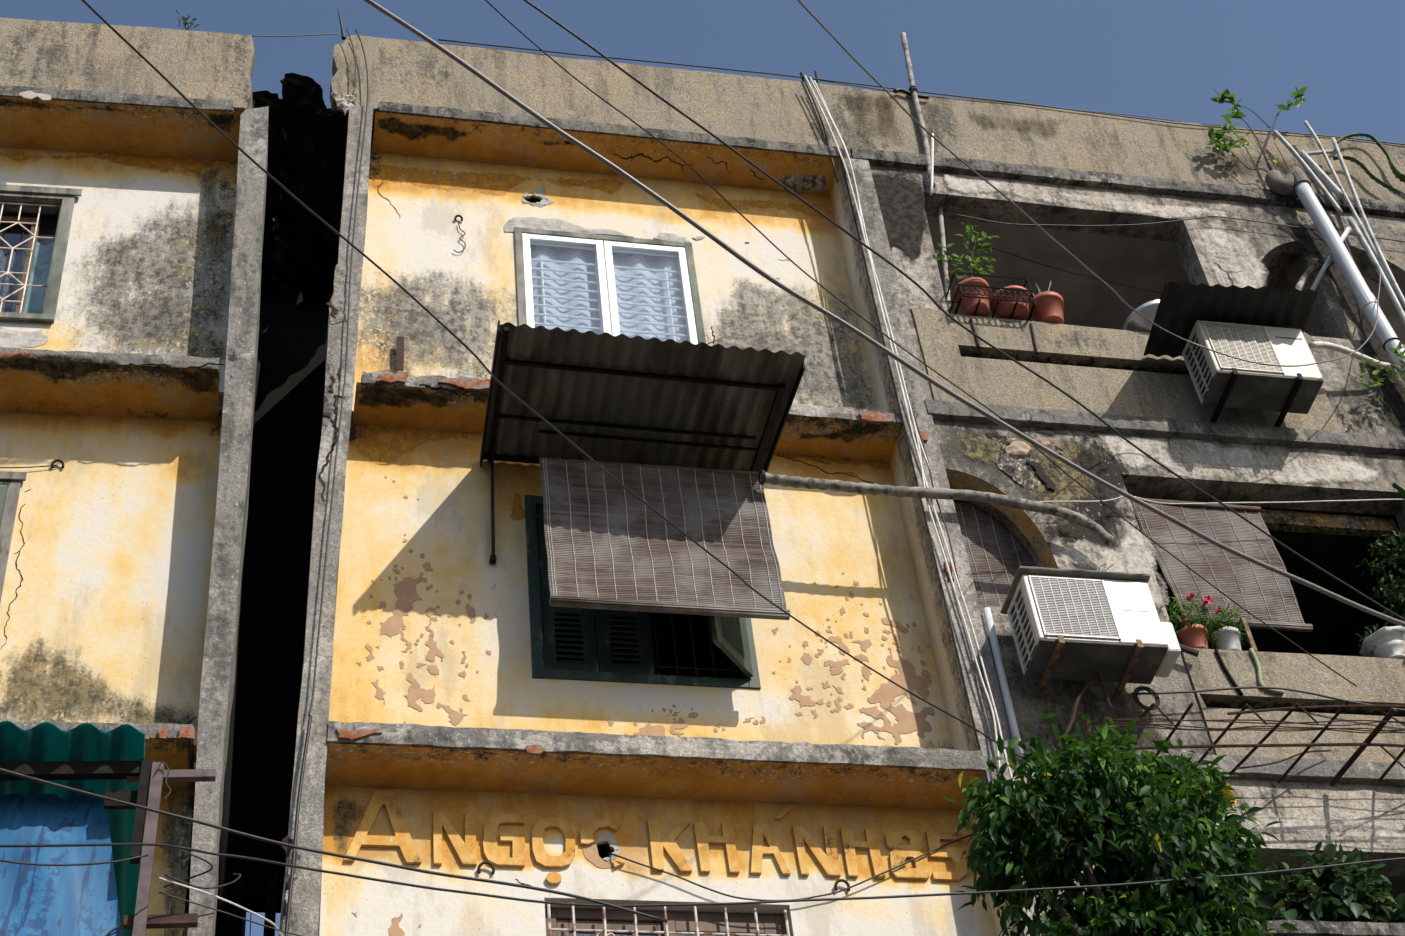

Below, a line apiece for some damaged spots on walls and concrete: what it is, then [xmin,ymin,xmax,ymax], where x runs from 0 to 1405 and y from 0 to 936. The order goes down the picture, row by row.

leakage [0,153,226,349]
leakage [377,272,495,364]
leakage [718,280,861,397]
crack [1,489,31,648]
leakage [0,642,176,724]
peeling [356,534,498,726]
peeling [608,704,699,737]
peeling [772,572,935,745]
spalling [985,432,1063,493]
leakage [959,428,1378,604]